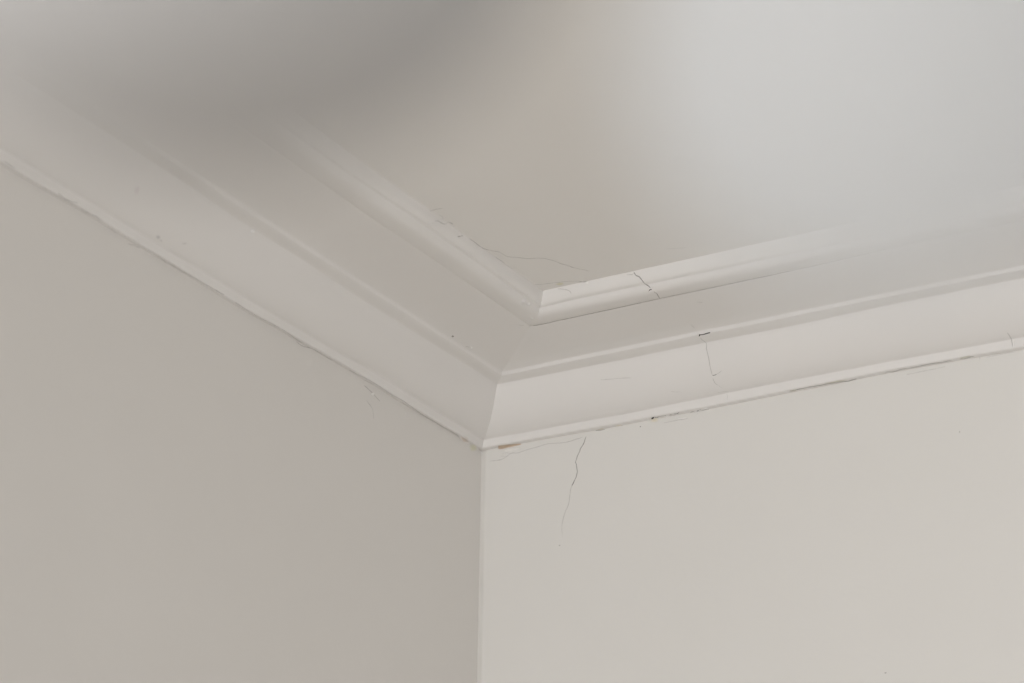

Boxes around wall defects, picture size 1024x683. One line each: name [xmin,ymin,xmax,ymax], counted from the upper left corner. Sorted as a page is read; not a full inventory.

crack [470,239,780,326]
crack [691,325,728,398]
crack [494,437,586,523]